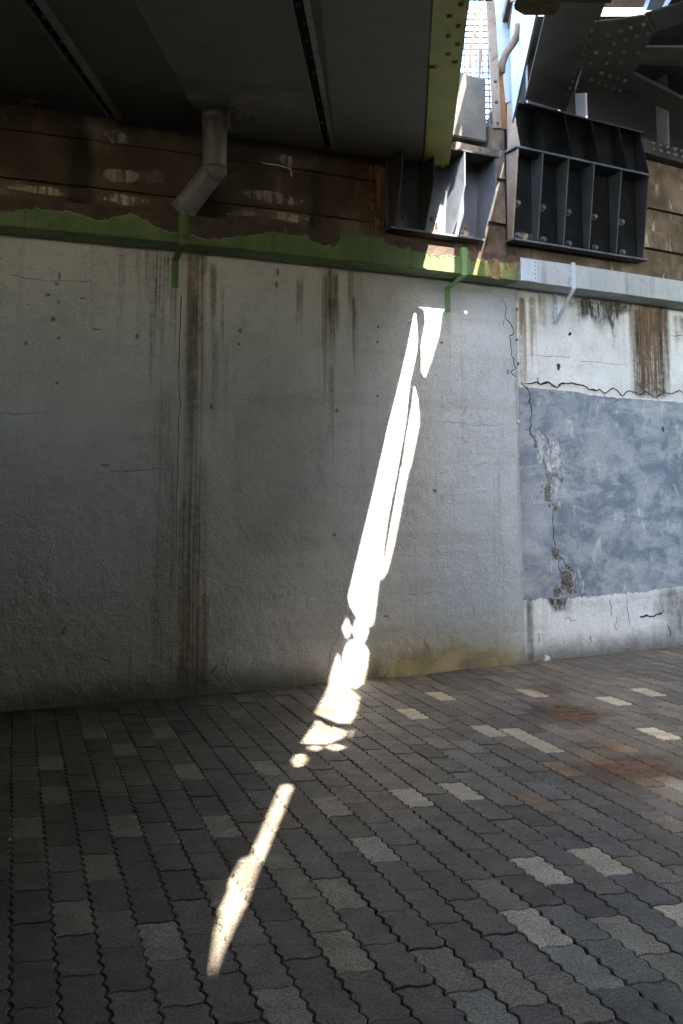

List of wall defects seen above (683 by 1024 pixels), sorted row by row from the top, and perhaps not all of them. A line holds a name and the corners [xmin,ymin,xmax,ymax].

peeling [0,195,341,248]
corrosion [519,297,541,381]
corrosion [630,305,669,395]
crack [503,298,683,583]
spalling [540,471,564,511]
spalling [550,546,576,598]
crack [640,610,664,620]